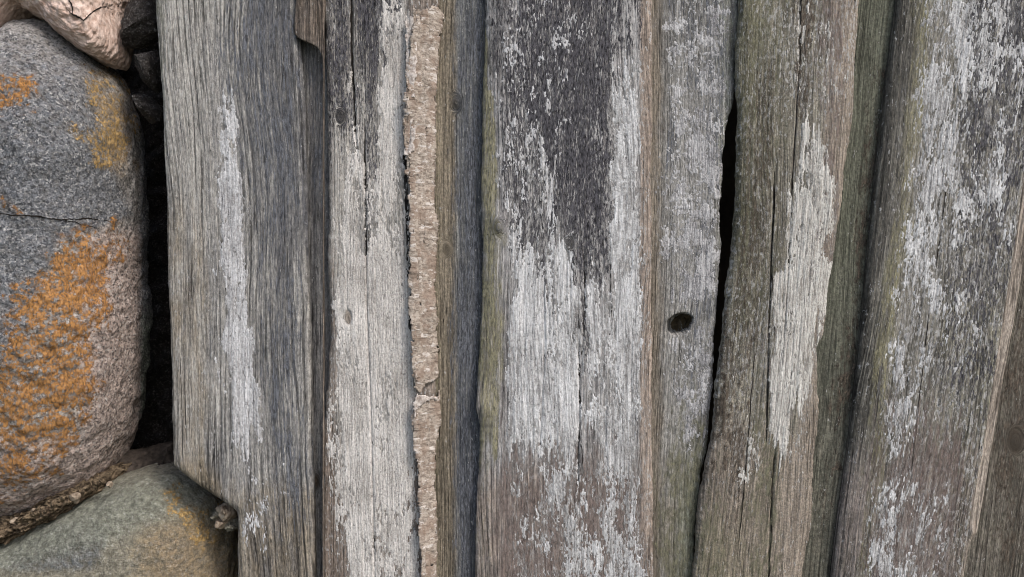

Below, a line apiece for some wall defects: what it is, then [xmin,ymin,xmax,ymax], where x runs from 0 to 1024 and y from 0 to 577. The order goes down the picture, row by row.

crack [0,213,111,228]